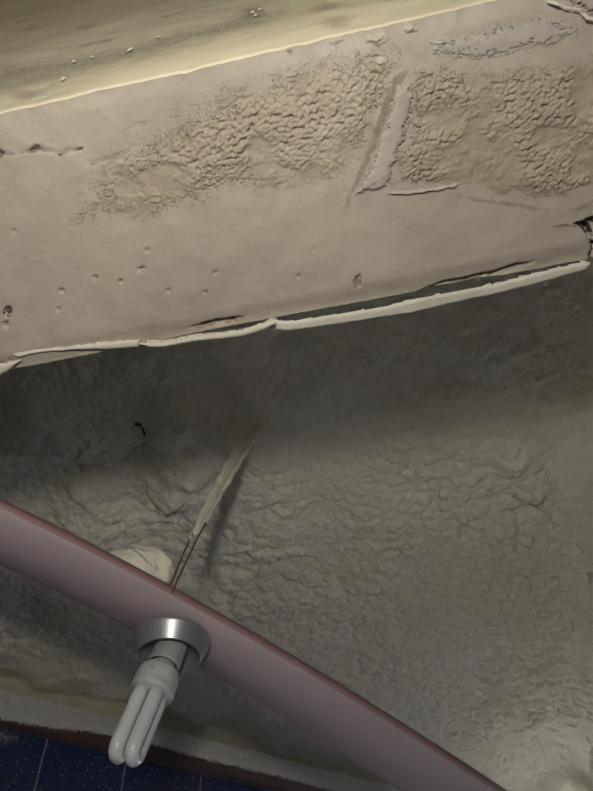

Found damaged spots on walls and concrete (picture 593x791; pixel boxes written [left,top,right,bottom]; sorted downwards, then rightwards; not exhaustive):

peeling [546,0,593,21]
crack [27,143,84,156]
crack [554,216,593,256]